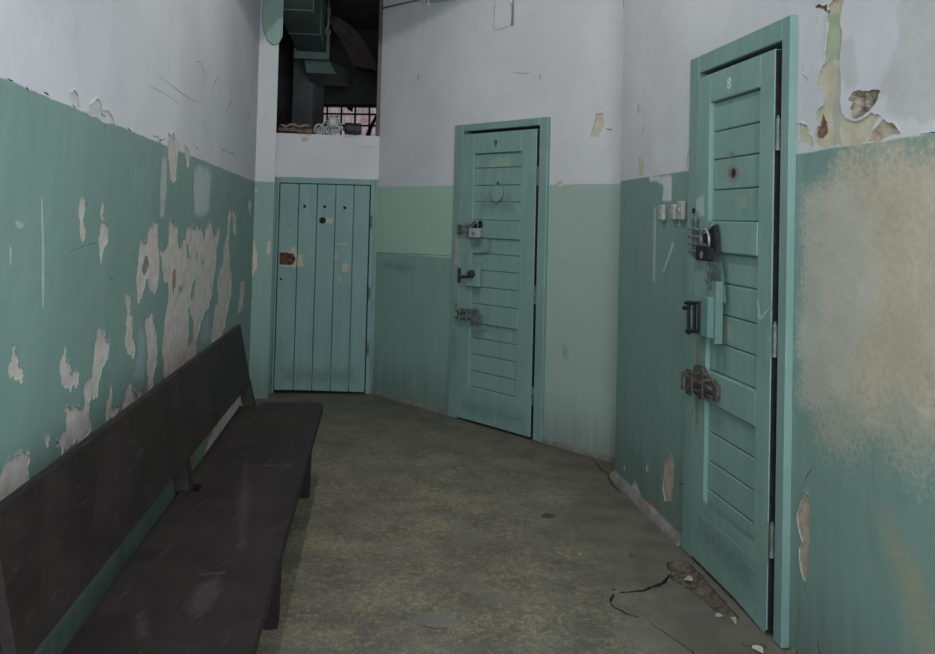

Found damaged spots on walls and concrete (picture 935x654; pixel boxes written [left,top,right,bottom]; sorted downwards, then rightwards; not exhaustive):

peeling [68,87,115,124]
peeling [590,111,605,138]
peeling [167,131,190,183]
peeling [78,189,87,242]
rust [279,252,295,265]
peeling [792,0,935,527]
peeling [44,200,304,456]
peeling [0,447,31,501]
peeling [662,448,674,502]
peeling [795,488,810,582]
crack [609,575,694,654]